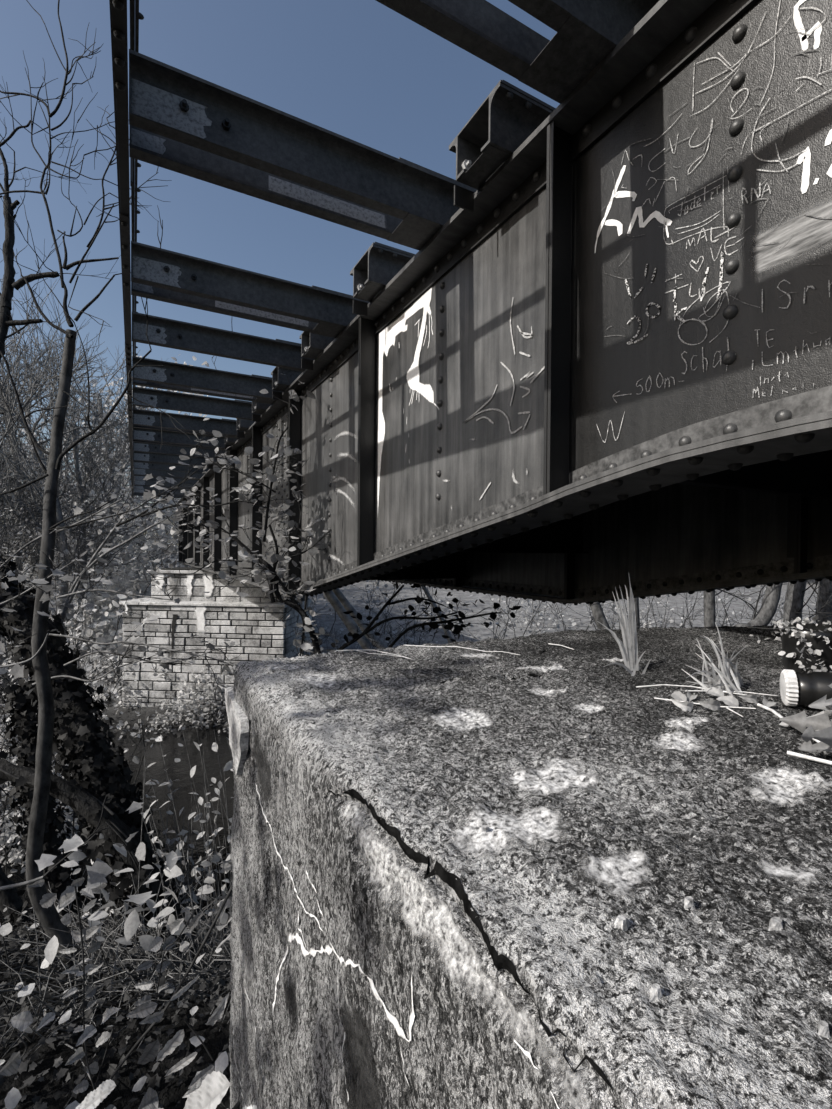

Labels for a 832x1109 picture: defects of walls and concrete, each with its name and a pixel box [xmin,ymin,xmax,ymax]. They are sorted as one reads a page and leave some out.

crack [324,789,622,1109]